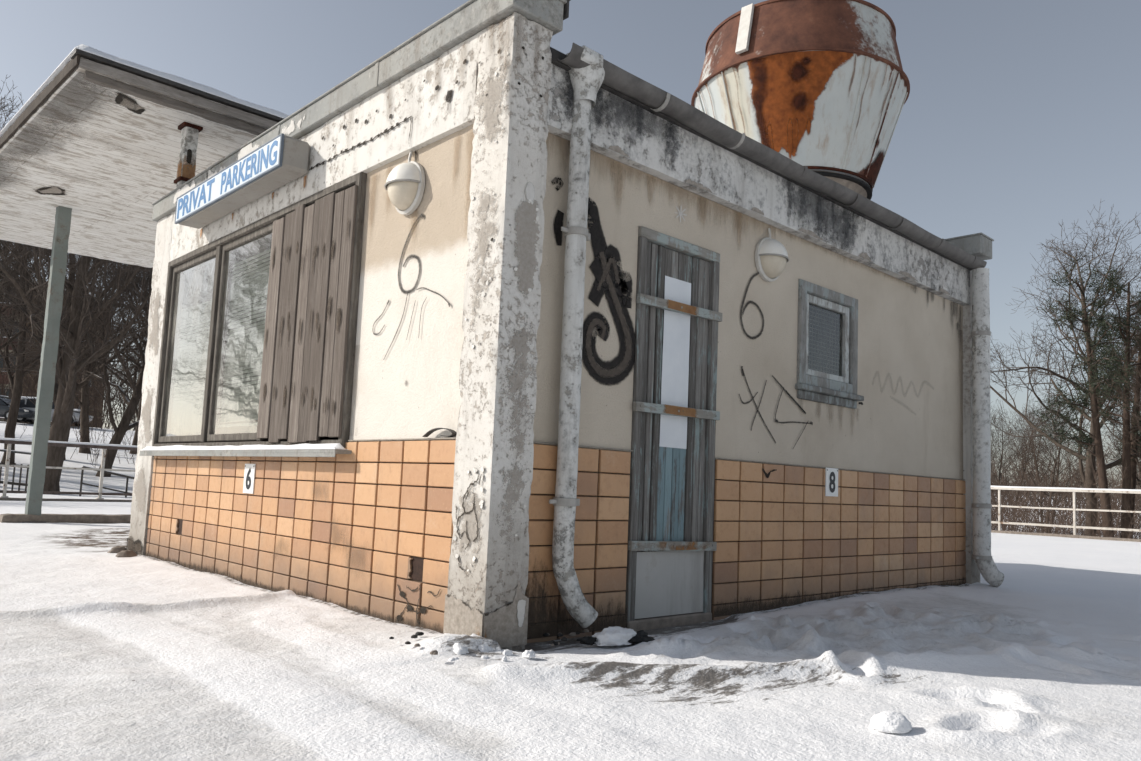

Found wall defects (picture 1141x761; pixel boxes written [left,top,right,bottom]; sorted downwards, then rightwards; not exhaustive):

peeling [282,116,305,135]
corrosion [723,51,871,159]
corrosion [176,149,196,179]
peeling [173,142,259,204]
corrosion [864,139,884,188]
leakage [788,180,856,249]
peeling [452,323,536,572]
spalling [407,557,424,581]
spalling [443,581,529,648]